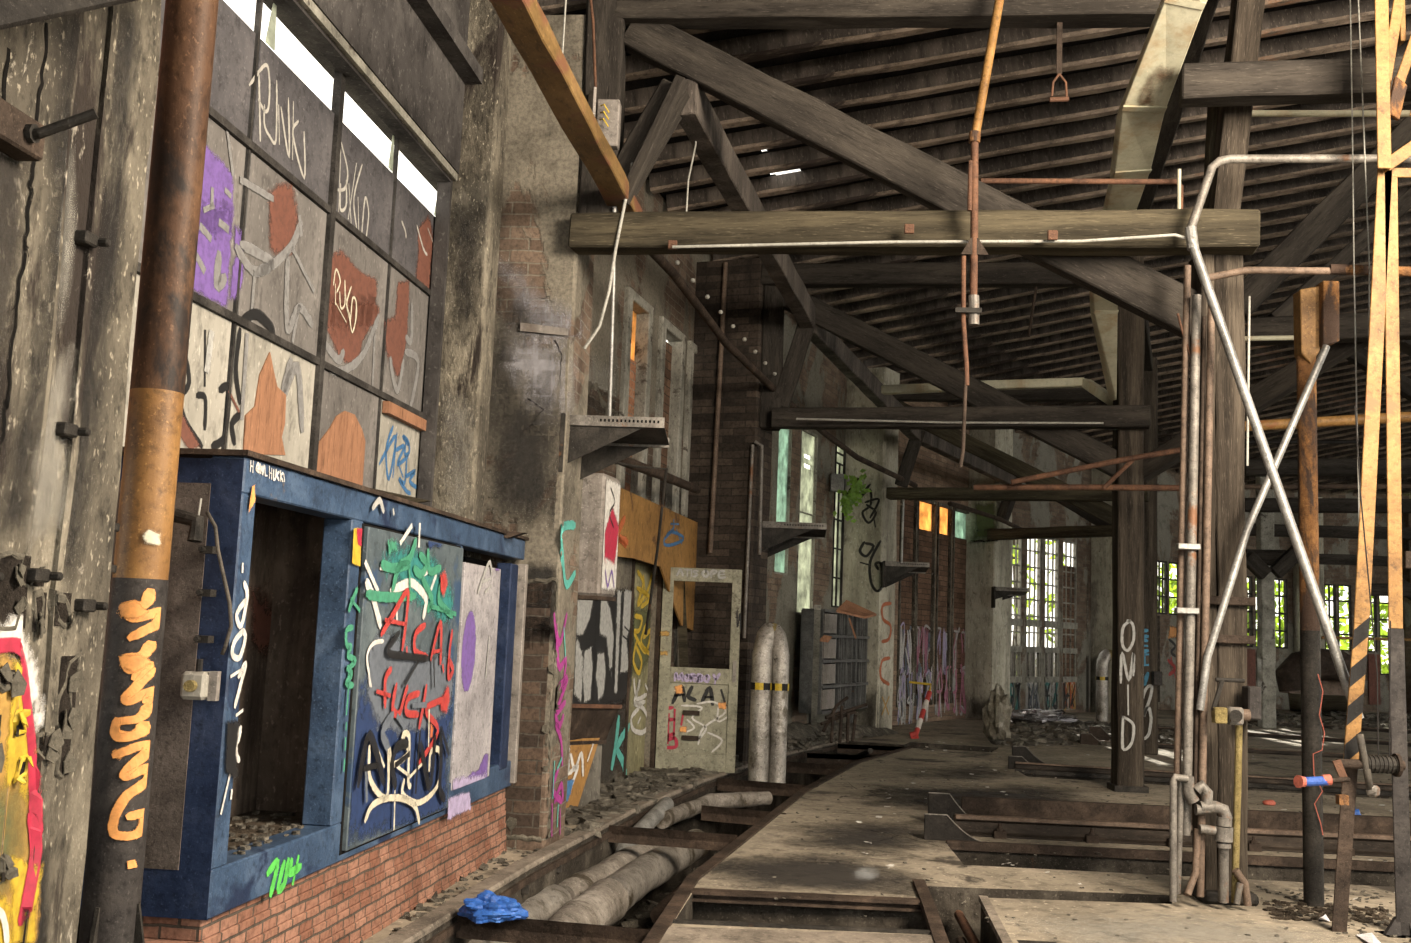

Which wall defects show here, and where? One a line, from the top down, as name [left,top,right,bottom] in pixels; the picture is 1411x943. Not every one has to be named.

leakage [60,190,70,290]
leakage [35,376,62,529]